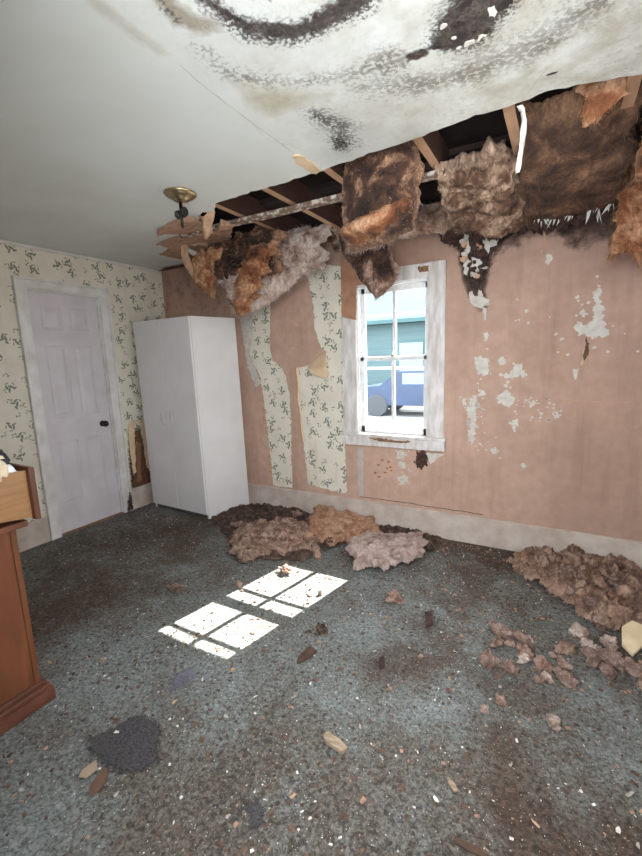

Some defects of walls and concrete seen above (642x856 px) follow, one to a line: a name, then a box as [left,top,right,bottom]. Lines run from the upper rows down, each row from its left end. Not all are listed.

damp [159,0,379,47]
damp [367,0,519,71]
damp [525,0,608,52]
damp [397,57,503,92]
mould [310,111,353,151]
flaking render [340,258,365,320]
peeling [438,230,498,320]
peeling [573,275,614,353]
peeling [239,313,273,481]
peeling [459,332,562,459]
flaking render [368,437,444,485]